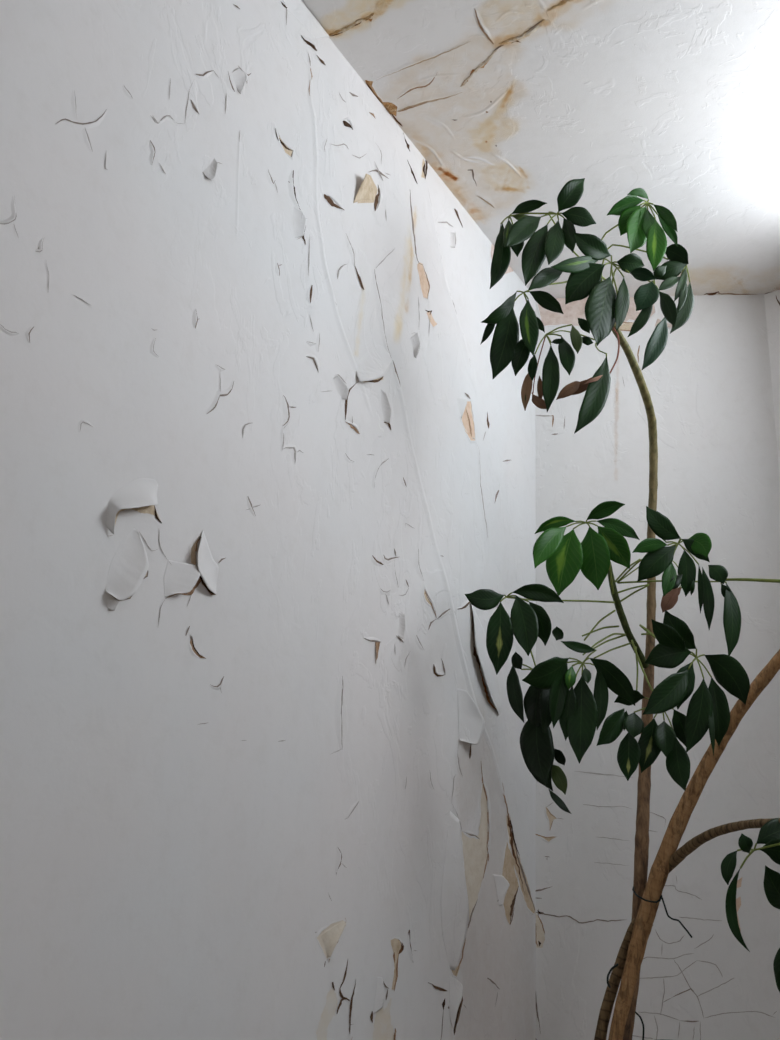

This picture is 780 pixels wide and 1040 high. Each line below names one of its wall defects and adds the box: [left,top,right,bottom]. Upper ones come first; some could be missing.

peeling [276,0,329,38]
water stain [329,0,390,36]
peeling [353,161,390,211]
spalling [364,79,402,126]
water stain [408,92,523,208]
water stain [397,0,604,112]
peeling [408,189,438,358]
peeling [323,345,393,430]
peeling [105,478,225,625]
peeling [452,604,520,928]
crack [536,887,621,924]
crack [632,877,777,1040]